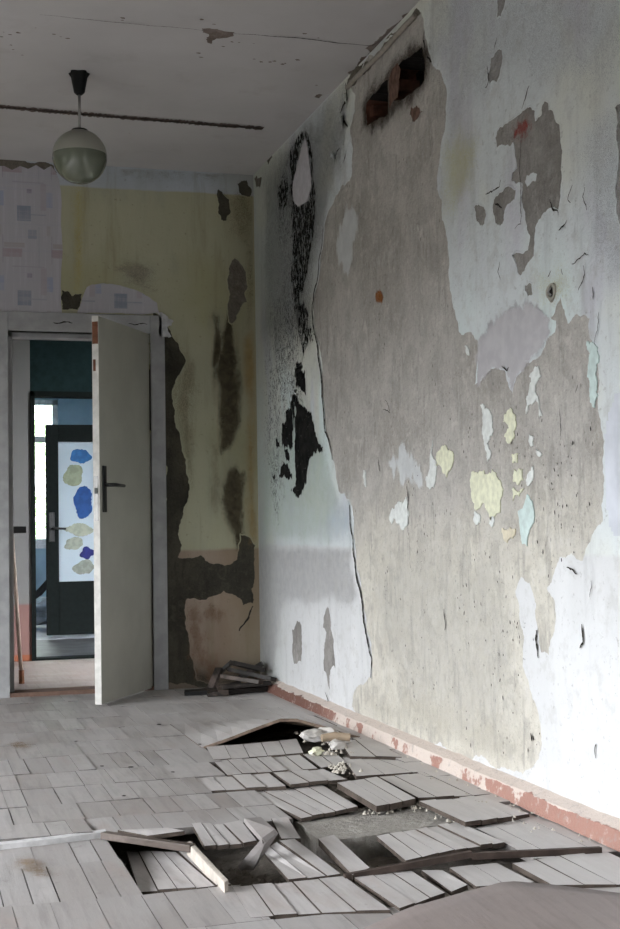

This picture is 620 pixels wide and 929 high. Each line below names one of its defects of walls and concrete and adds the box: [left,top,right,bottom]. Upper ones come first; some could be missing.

crack [0,105,264,130]
peeling [200,19,240,47]
peeling [149,312,256,688]
water stain [114,81,360,685]
peeling [312,5,606,778]